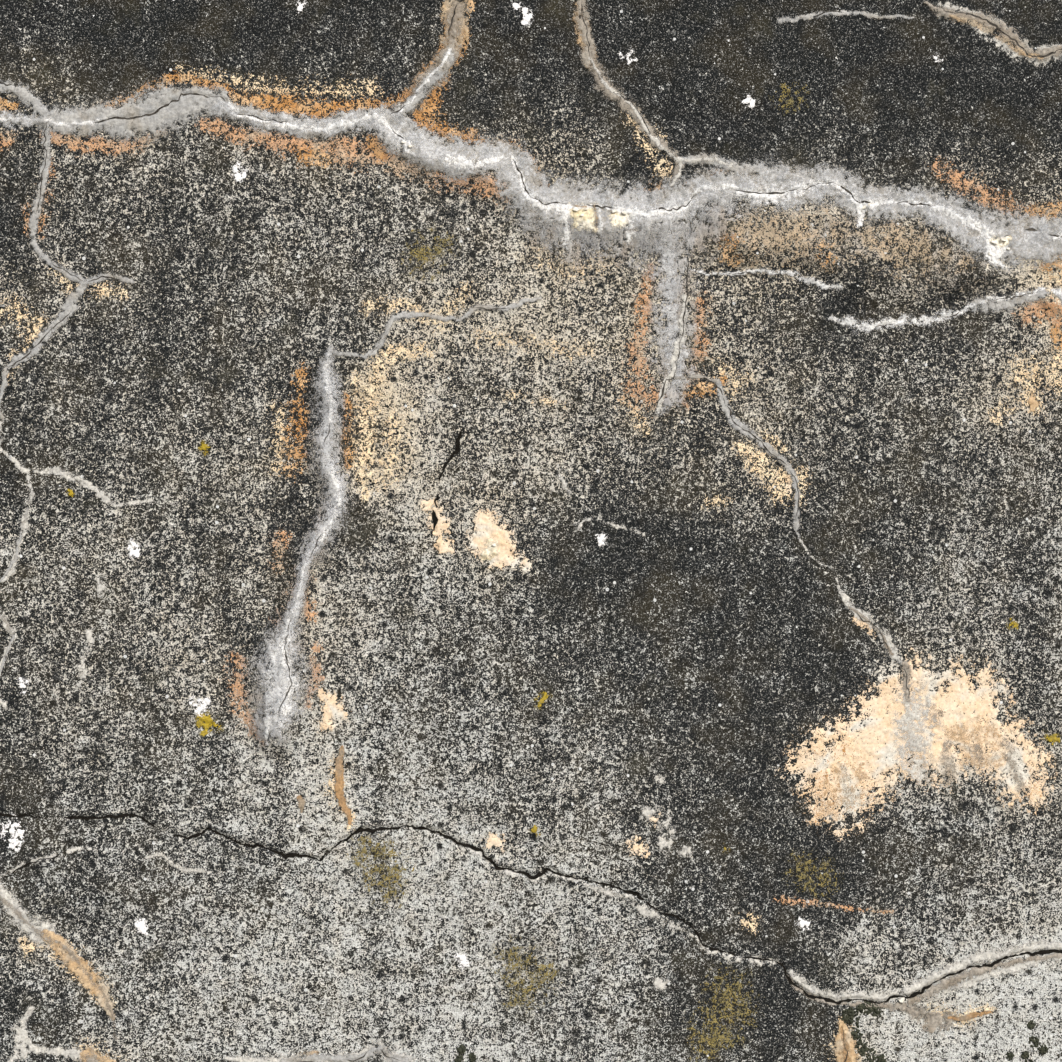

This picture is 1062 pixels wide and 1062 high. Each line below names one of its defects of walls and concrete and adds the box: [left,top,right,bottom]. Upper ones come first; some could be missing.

rust [40,131,164,159]
rust [100,0,550,187]
rust [195,115,513,211]
rust [932,156,1062,219]
crack [0,0,1062,710]
rust [988,254,1062,426]
spalling [420,495,534,573]
spalling [774,647,1062,842]
crack [0,813,1062,1040]